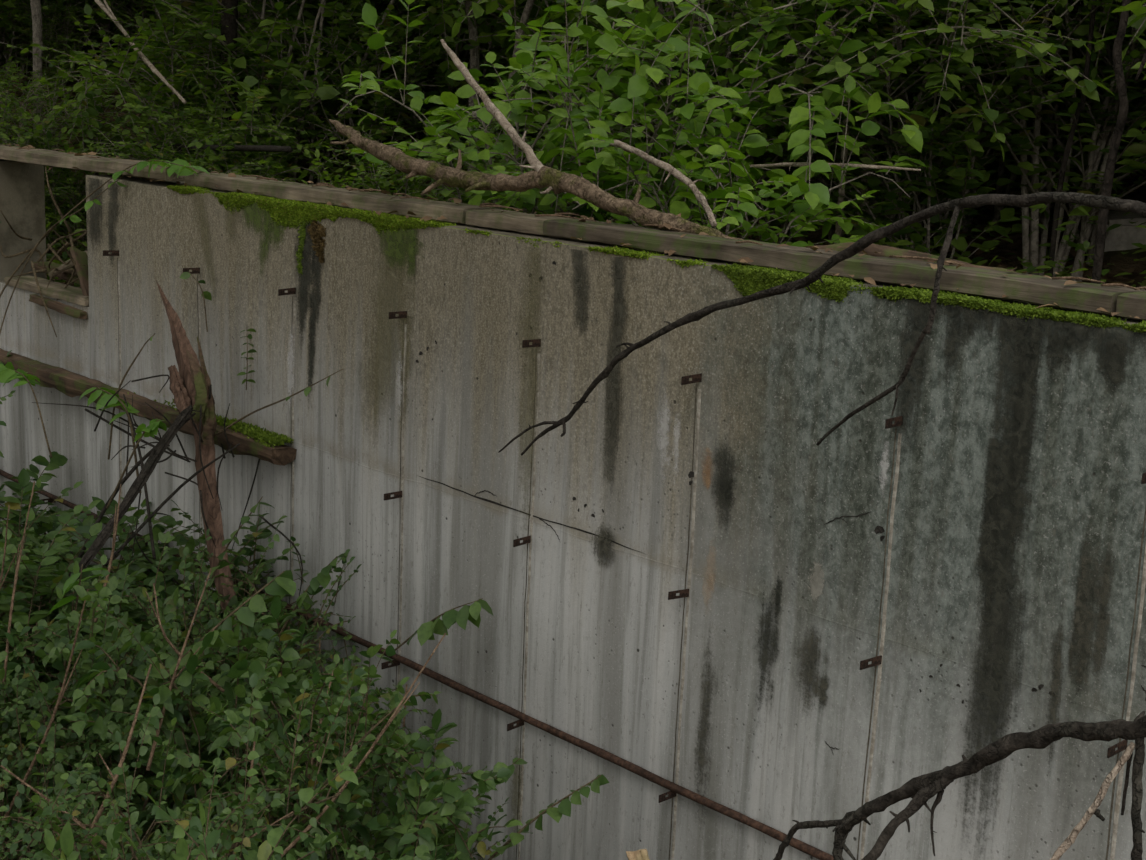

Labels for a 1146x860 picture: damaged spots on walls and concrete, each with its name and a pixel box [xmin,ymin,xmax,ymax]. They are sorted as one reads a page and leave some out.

damp [712,445,734,523]
damp [895,299,1146,759]
damp [758,578,782,710]
damp [964,760,1001,849]